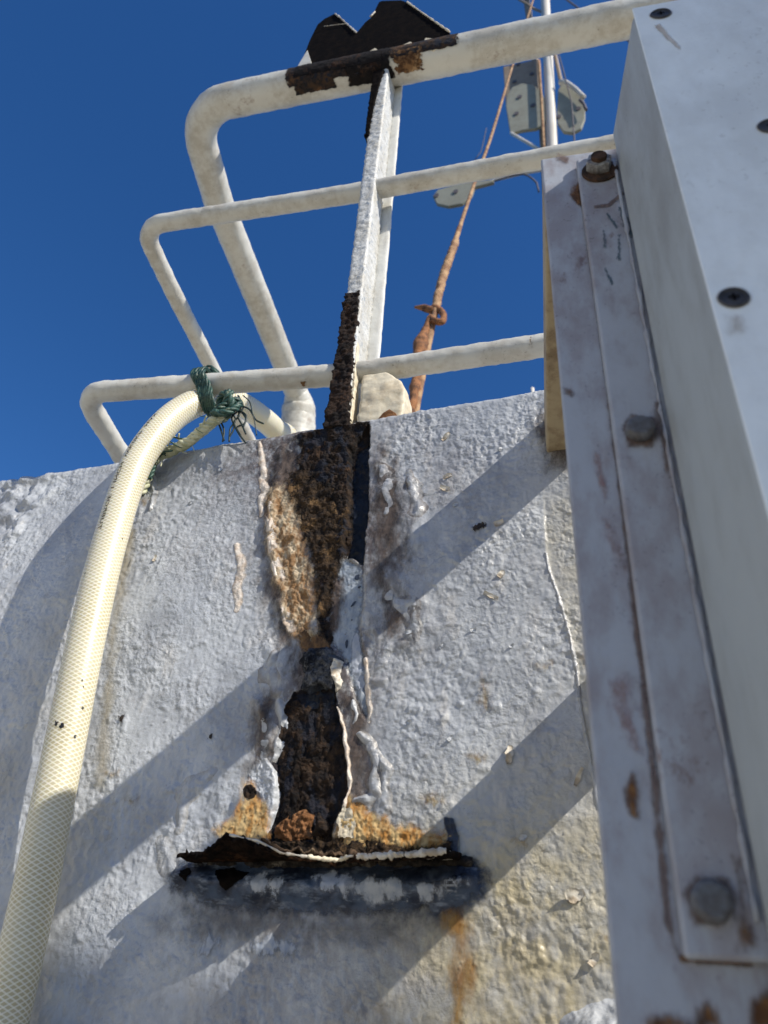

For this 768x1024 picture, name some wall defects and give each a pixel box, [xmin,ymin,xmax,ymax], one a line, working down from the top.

rust [285,33,459,96]
rust [264,290,397,651]
peeling [326,446,370,717]
peeling [213,756,281,838]
peeling [336,706,353,807]
rust [268,689,453,863]
peeling [215,867,249,890]
peeling [393,865,466,885]